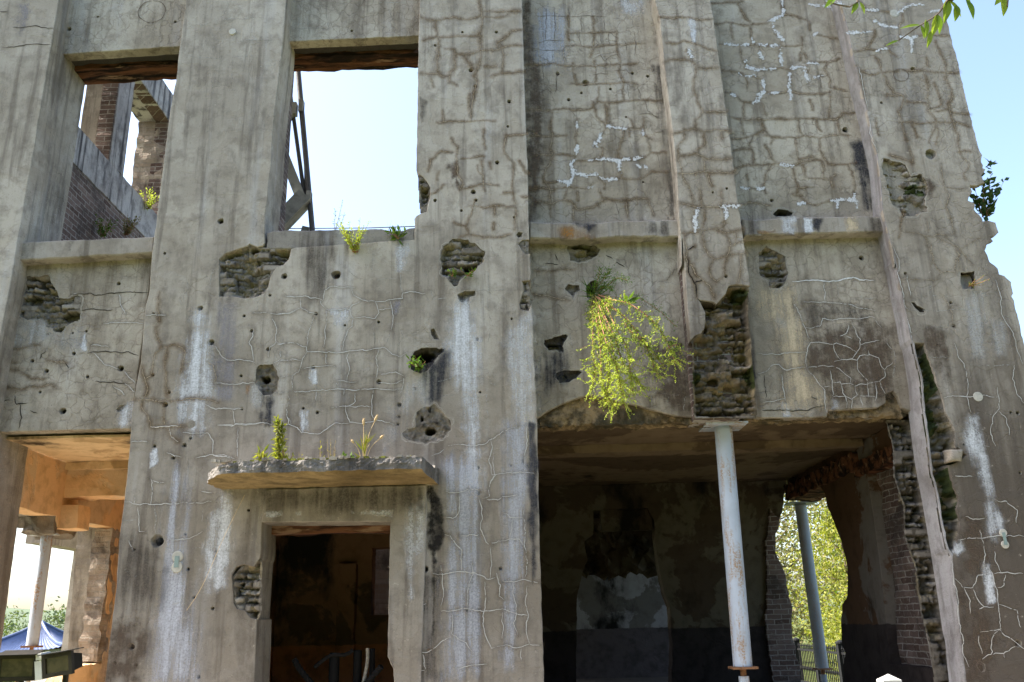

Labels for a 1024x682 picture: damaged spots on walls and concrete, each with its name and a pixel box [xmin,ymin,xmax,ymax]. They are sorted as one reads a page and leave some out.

spalling [880,157,929,218]
spalling [19,273,84,336]
spalling [220,245,291,298]
spalling [439,237,487,305]
crack [420,0,1024,671]
spalling [691,286,757,419]
spalling [755,244,790,290]
crack [4,274,443,550]
spalling [401,401,455,446]
water stain [966,418,992,490]
water stain [315,302,479,677]
spalling [233,558,263,619]